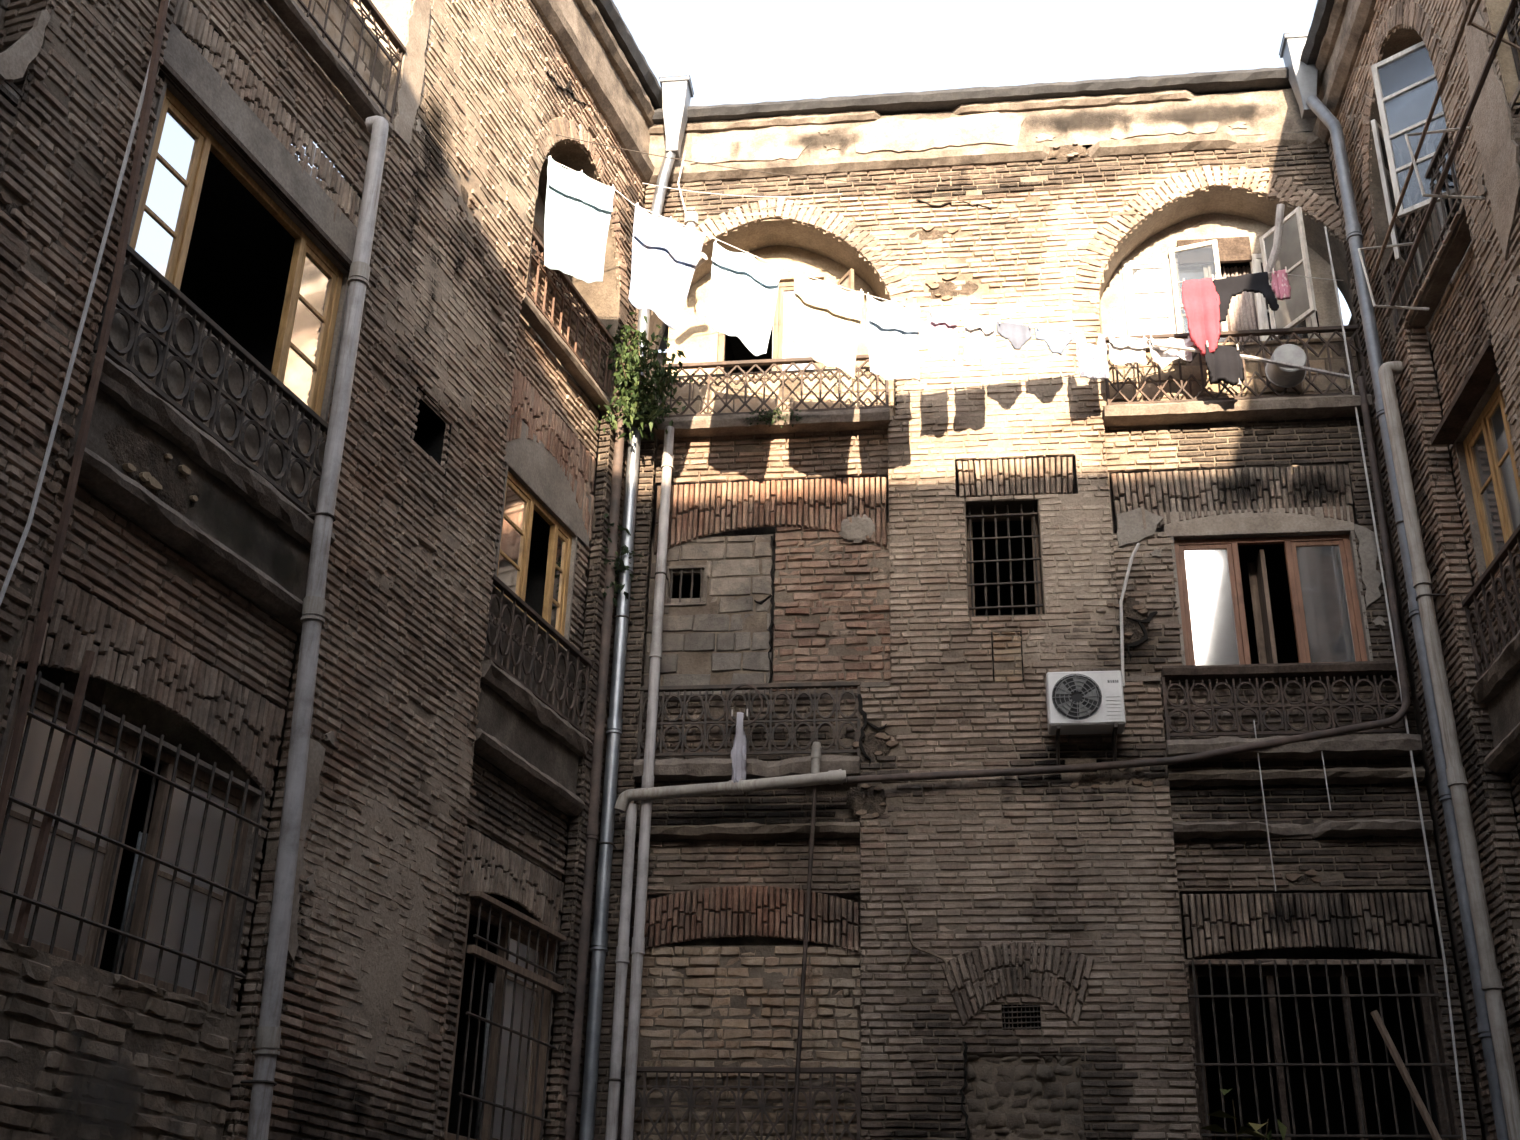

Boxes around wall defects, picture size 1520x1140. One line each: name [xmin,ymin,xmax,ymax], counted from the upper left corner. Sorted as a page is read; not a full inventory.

flaking render [690,112,1089,165]
flaking render [1111,120,1247,140]